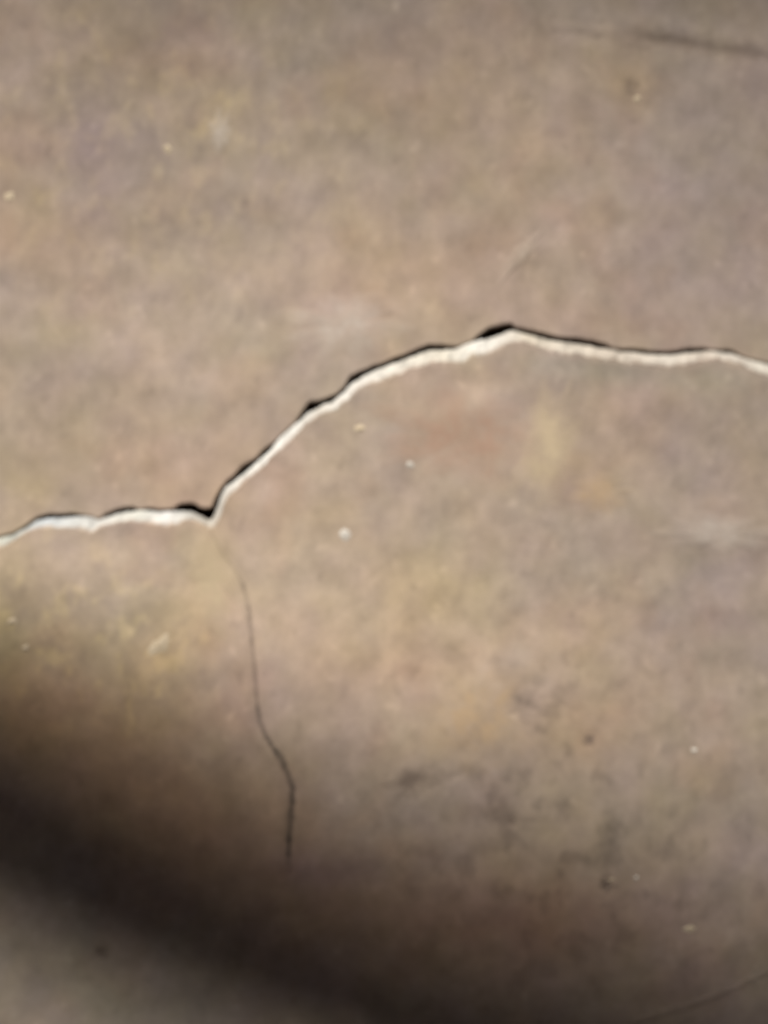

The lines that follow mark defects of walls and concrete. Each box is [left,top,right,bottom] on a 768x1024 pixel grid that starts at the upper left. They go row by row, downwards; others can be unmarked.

crack [0,325,768,872]